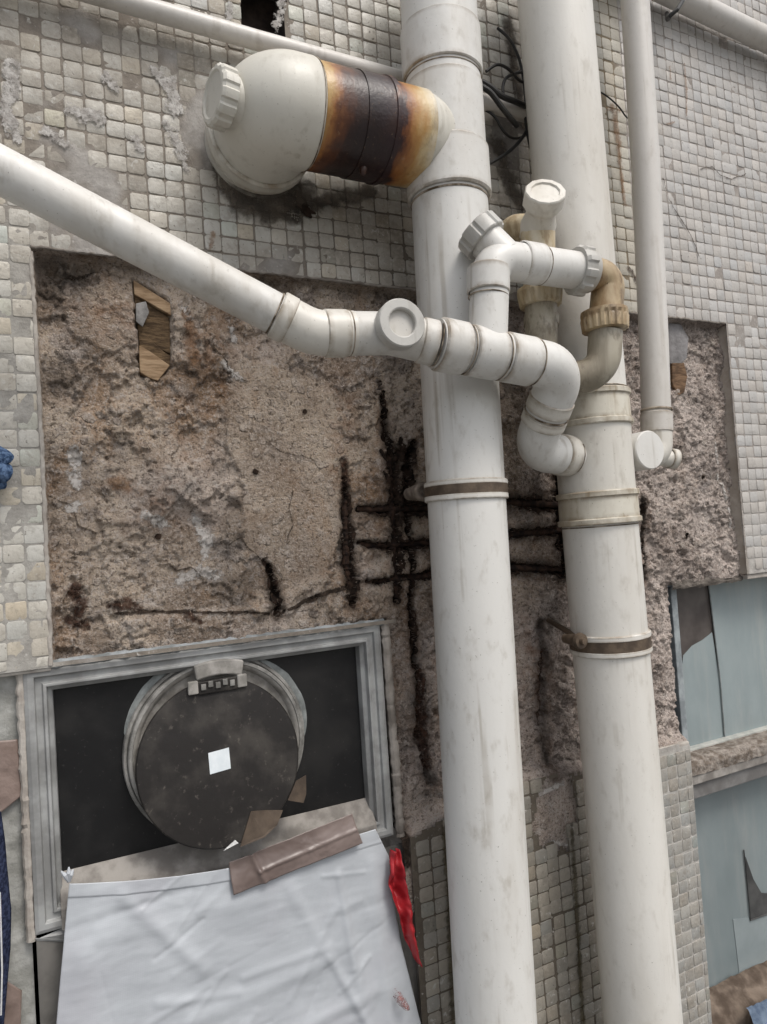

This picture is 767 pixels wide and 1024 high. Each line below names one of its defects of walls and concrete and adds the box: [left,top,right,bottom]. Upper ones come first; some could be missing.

leakage [213,167,377,224]
spalling [508,301,525,334]
spalling [623,314,641,434]
spalling [31,249,444,912]
rust [339,457,432,598]
rust [506,499,558,508]
rust [508,527,562,537]
rust [510,564,562,572]
spalling [499,382,583,852]
spalling [635,318,745,748]
rust [412,664,432,770]